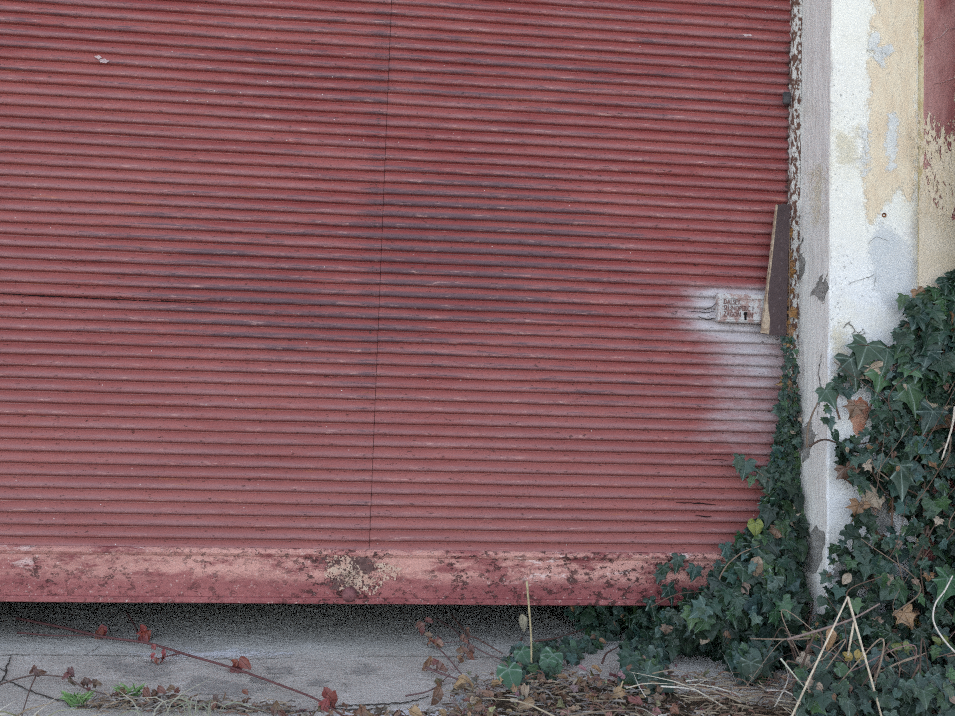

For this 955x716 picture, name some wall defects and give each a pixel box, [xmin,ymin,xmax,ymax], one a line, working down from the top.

peeling [833,0,955,289]